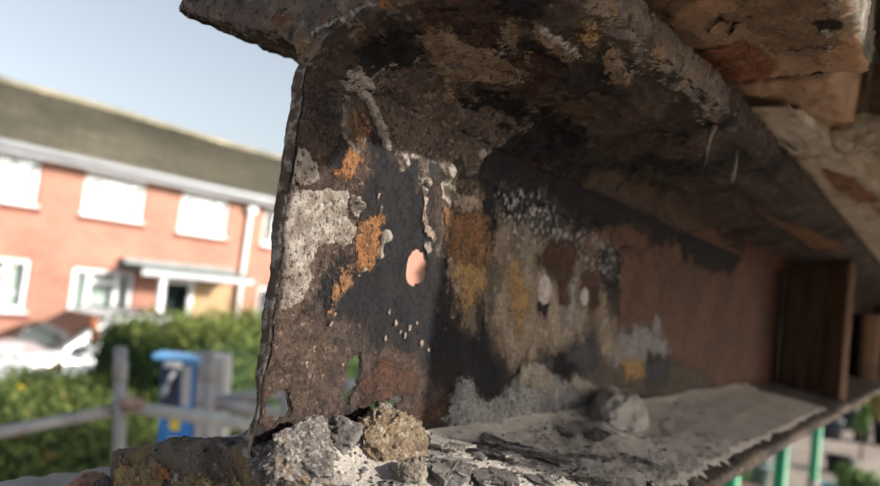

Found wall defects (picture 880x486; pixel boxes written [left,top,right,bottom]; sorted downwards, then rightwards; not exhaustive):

peeling [535,17,635,86]
spalling [697,40,780,84]
peeling [812,20,843,52]
peeling [341,70,411,168]
peeling [292,147,319,186]
peeling [421,164,460,205]
peeling [347,194,366,219]
corrosion [259,42,611,486]
peeling [67,471,110,486]
peeling [359,468,401,486]
peeling [439,415,612,486]
corrosion [633,456,661,467]